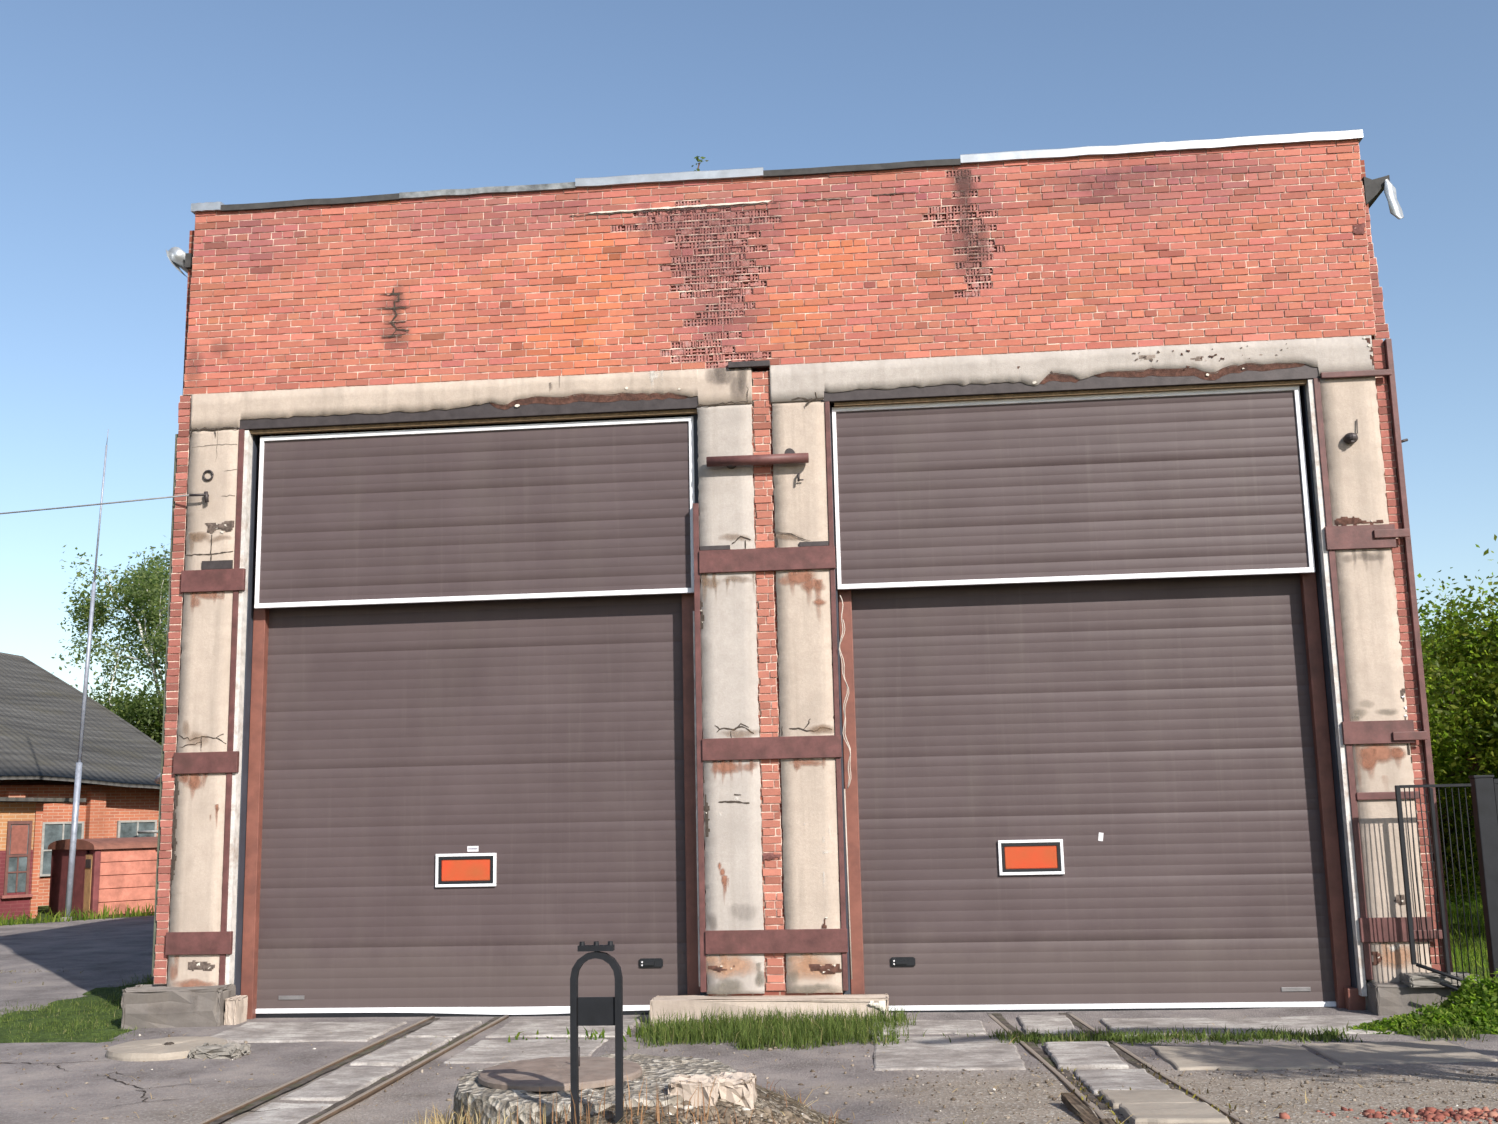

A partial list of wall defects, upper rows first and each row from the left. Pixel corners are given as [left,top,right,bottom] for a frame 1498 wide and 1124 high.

spalling [1032,343,1305,384]
spalling [489,387,688,410]
corrosion [782,570,824,604]
corrosion [713,760,753,773]
corrosion [1361,744,1404,769]
spalling [809,964,842,974]